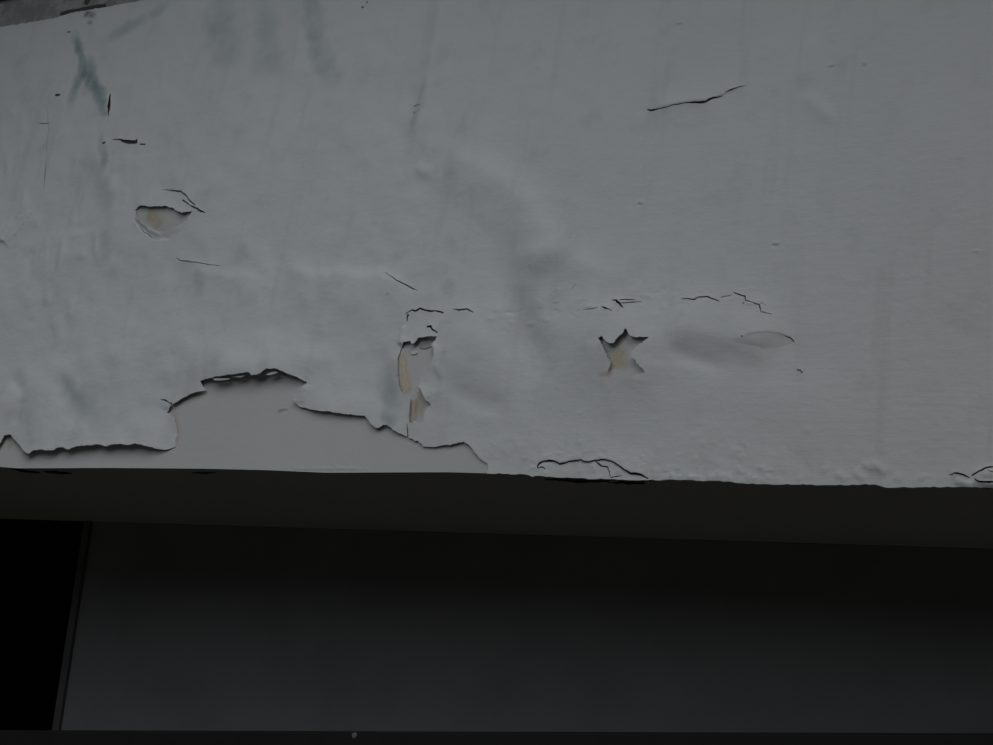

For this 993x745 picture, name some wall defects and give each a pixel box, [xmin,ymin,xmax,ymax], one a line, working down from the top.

peeling [0,0,140,27]
crack [647,86,743,111]
peeling [132,188,205,243]
crack [584,299,634,311]
crack [685,292,769,314]
peeling [589,319,655,385]
peeling [0,306,502,473]
crack [544,477,645,485]